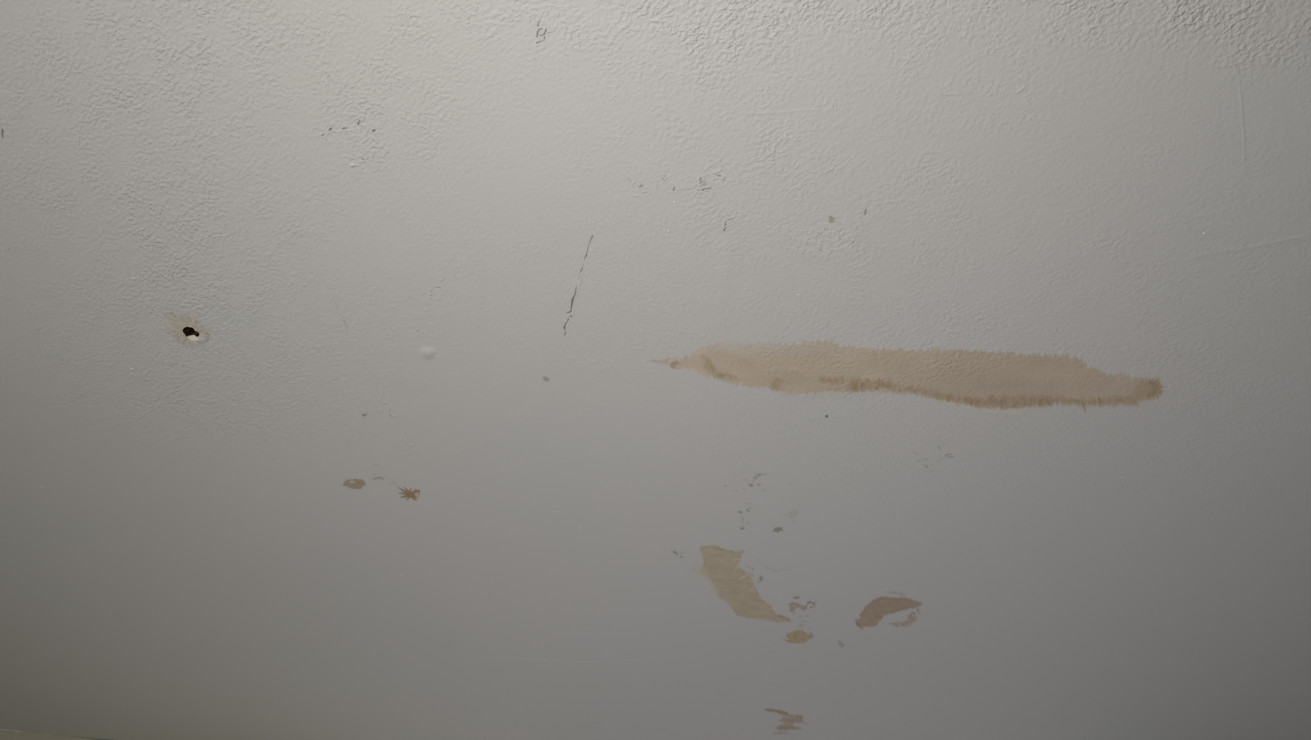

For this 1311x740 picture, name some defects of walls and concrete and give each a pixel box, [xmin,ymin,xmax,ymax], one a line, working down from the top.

leakage [648,337,1166,417]
peeling [688,543,815,645]
peeling [854,589,925,631]